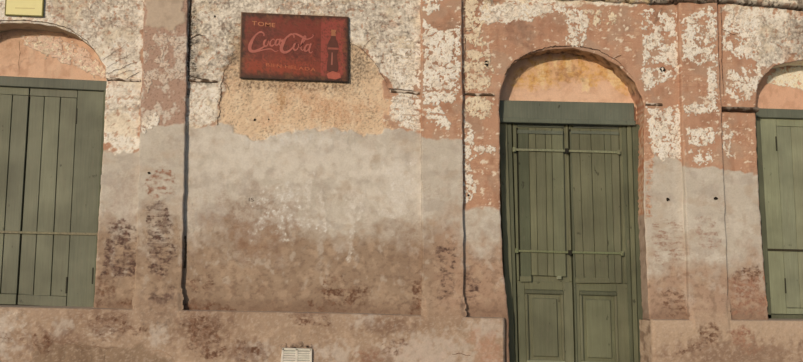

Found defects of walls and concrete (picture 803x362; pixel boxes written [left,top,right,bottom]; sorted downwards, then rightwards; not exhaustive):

peeling [0,33,106,78]
peeling [143,31,185,99]
peeling [385,0,617,203]
peeling [641,6,803,268]